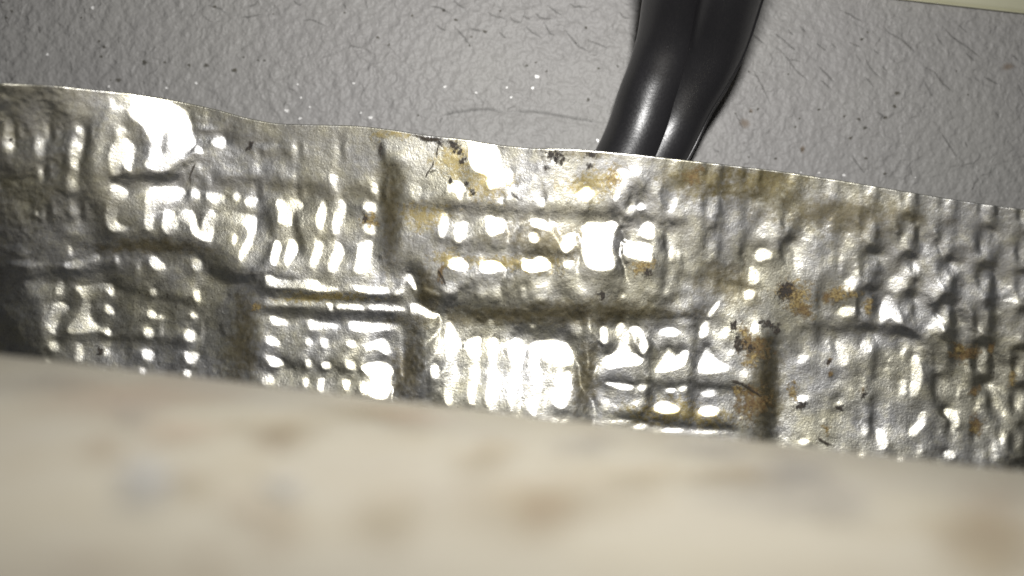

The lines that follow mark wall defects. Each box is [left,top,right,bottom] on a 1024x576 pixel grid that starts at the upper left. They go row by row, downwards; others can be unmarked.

corrosion [775,278,873,320]
corrosion [737,327,770,367]
corrosion [733,386,772,420]